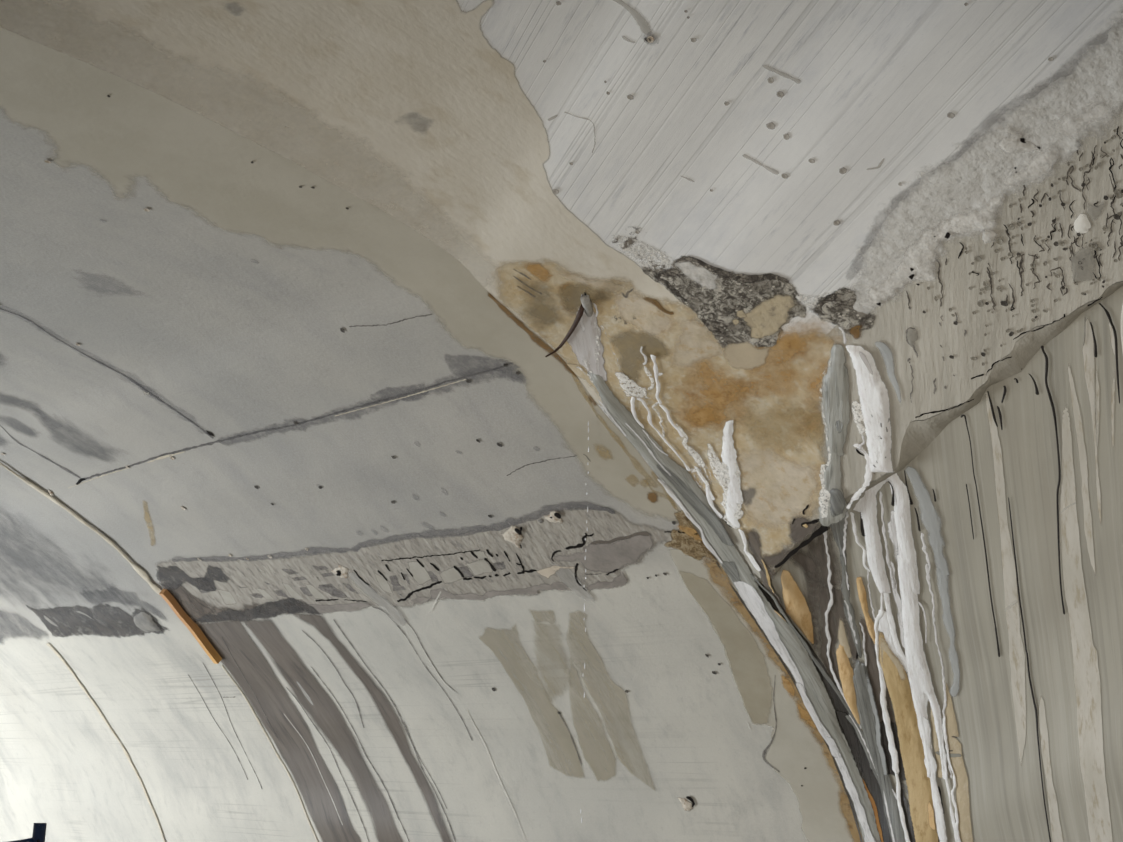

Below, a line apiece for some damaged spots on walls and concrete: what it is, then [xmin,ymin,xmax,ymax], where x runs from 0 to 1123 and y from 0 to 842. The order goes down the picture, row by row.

leakage [26,604,167,637]
crack [82,363,513,479]
leakage [156,566,518,842]
spalling [157,502,673,624]
corrosion [488,262,834,567]
peeling [676,262,717,289]
leakage [529,275,961,842]
corrosion [705,553,863,842]
leakage [853,23,1123,314]
crack [907,126,1123,418]